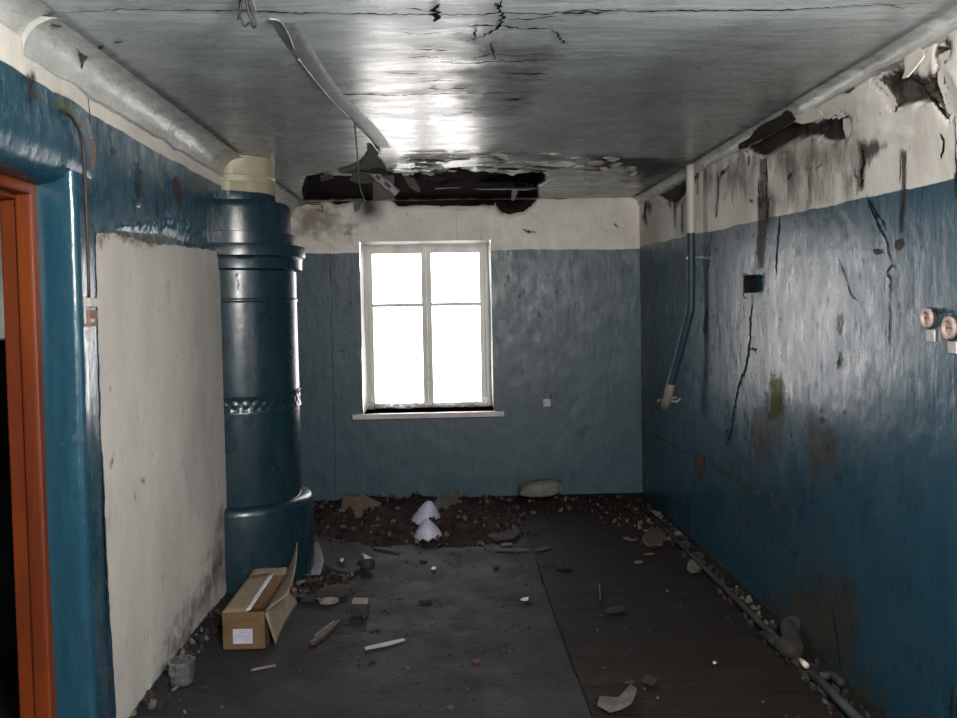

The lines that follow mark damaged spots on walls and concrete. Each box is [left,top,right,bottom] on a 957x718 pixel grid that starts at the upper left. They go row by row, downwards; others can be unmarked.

crack [48,0,916,96]
spalling [879,45,951,117]
spalling [303,146,698,214]
spalling [726,108,846,155]
water stain [858,141,879,187]
crack [917,80,957,184]
crack [854,146,906,343]